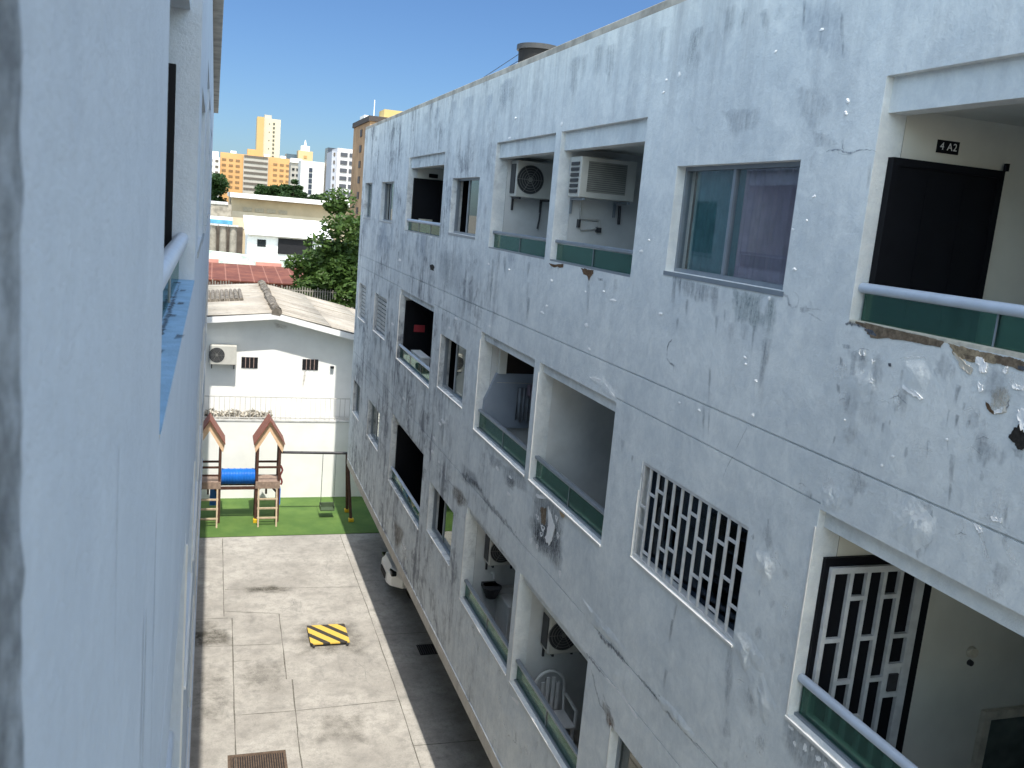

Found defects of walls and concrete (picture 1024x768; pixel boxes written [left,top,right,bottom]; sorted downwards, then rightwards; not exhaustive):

peeling [855,321,1024,450]
peeling [529,494,565,555]